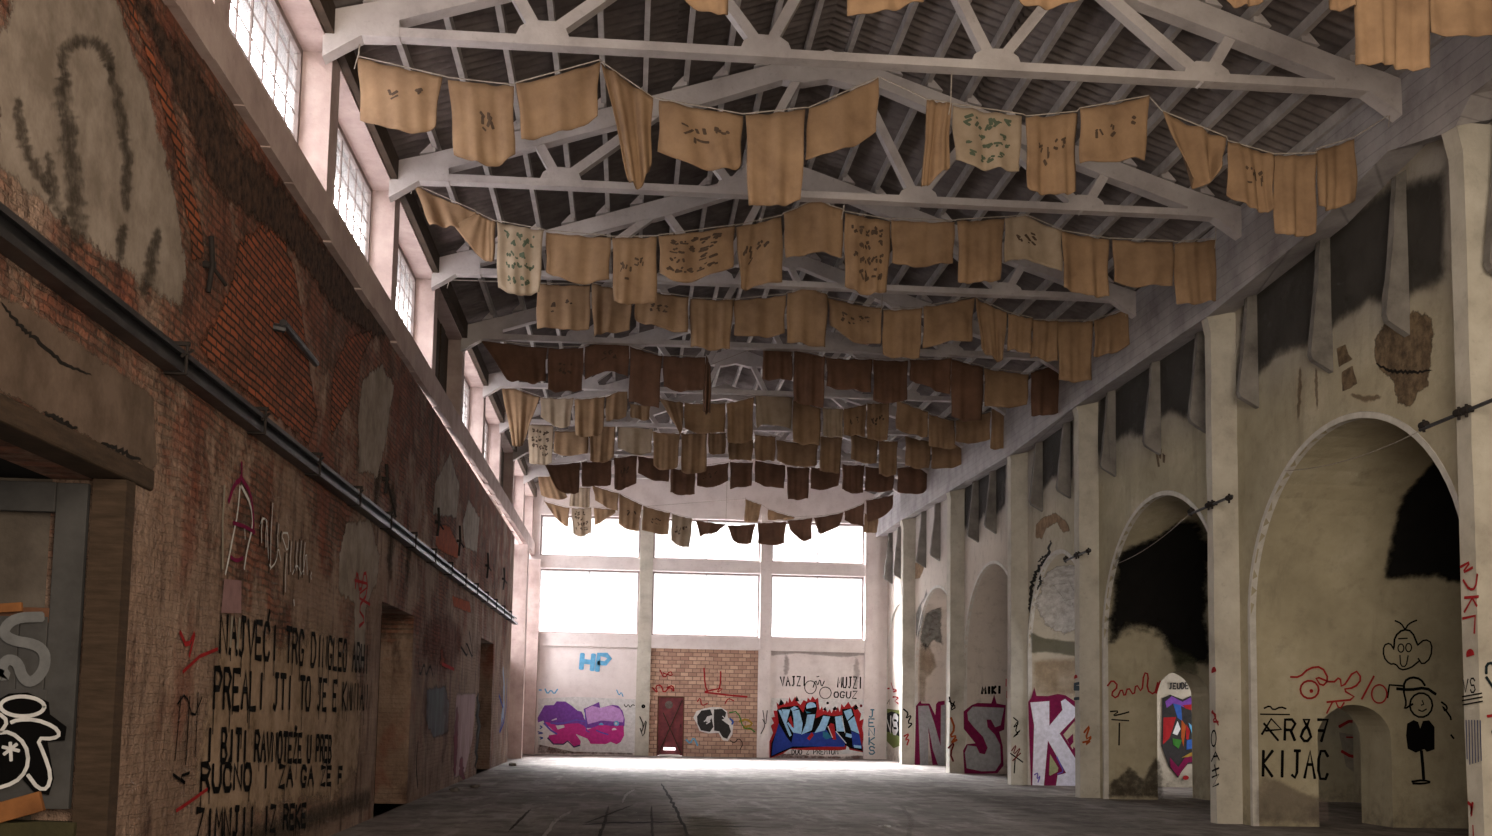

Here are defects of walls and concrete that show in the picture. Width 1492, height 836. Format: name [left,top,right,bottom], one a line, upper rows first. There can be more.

flaking render [1337,345,1357,391]
flaking render [1374,311,1433,406]